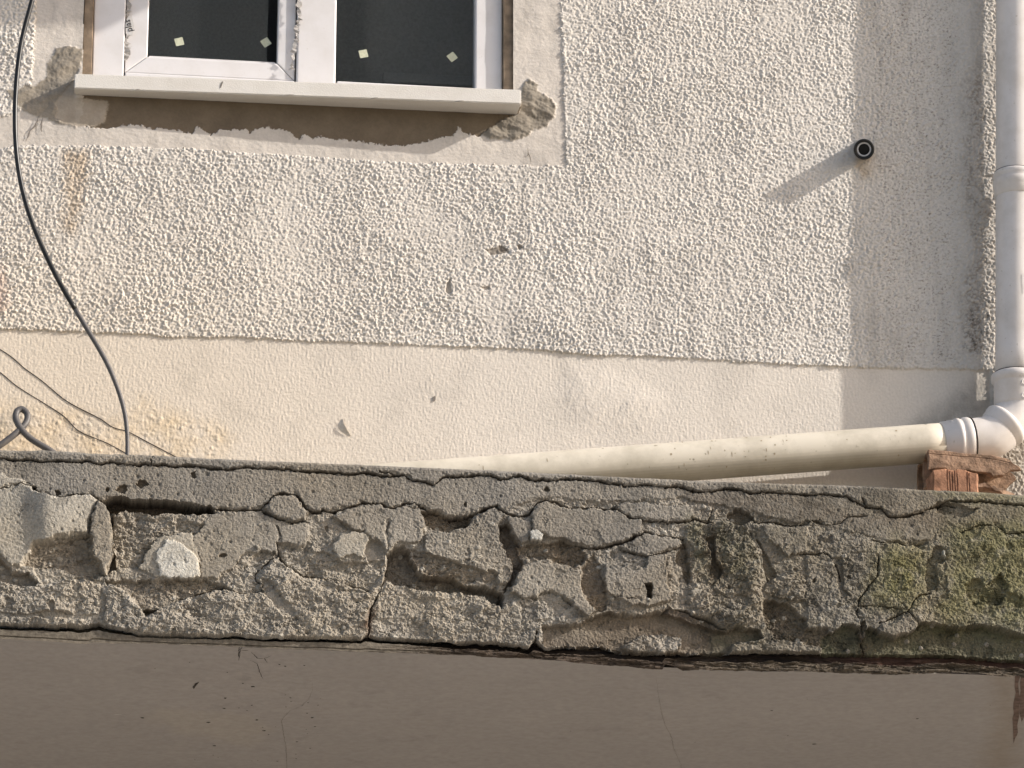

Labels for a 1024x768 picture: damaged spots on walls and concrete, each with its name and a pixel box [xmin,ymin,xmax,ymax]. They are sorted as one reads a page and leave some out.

spalling [0,496,226,617]
crack [0,456,1024,679]
spalling [246,501,1024,664]